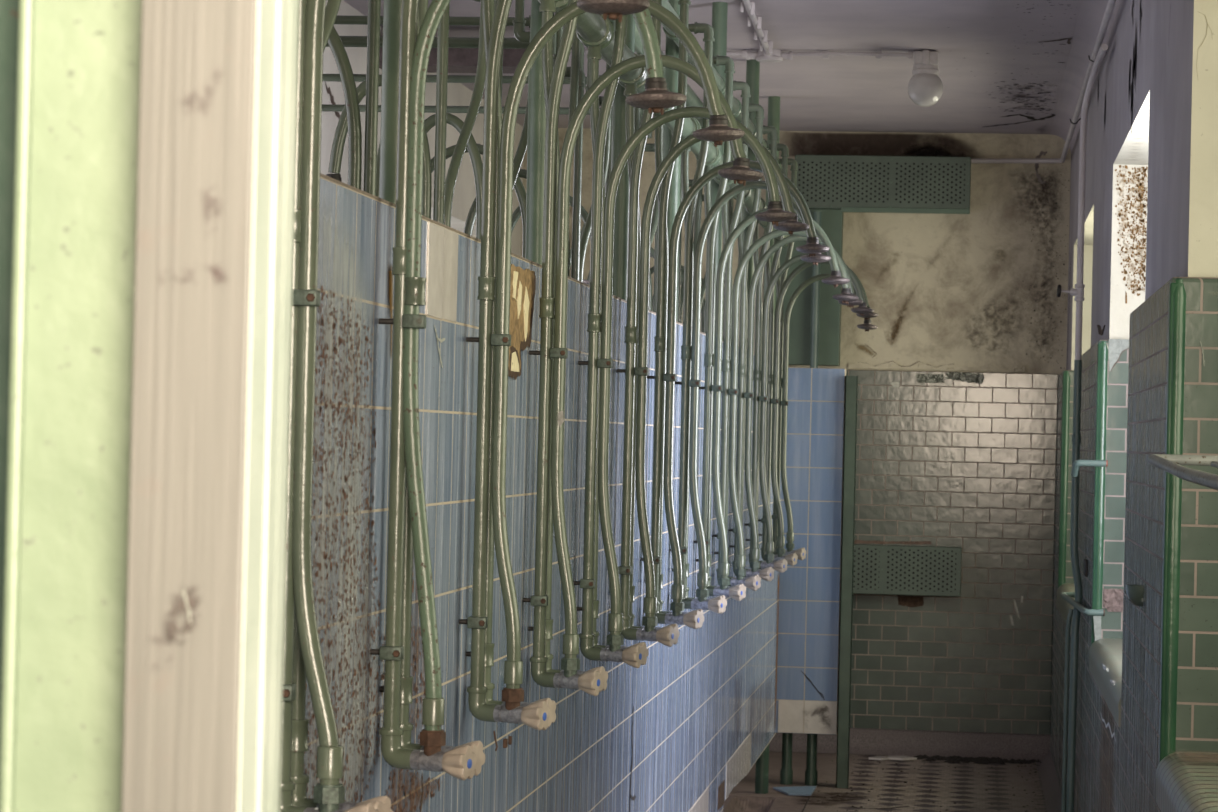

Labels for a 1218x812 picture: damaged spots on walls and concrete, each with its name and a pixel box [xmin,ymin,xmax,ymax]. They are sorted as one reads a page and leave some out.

rust [311,222,385,803]
rust [386,768,441,812]